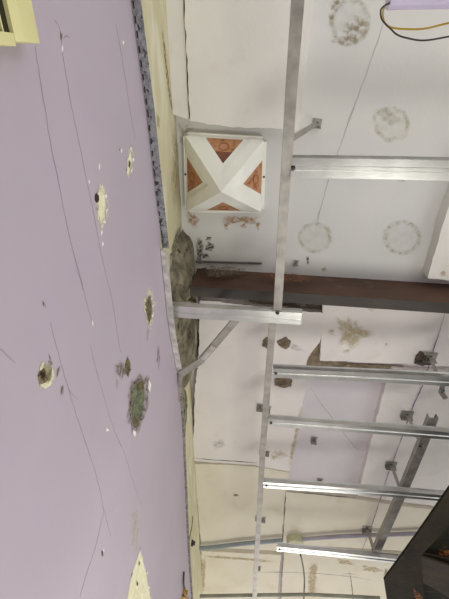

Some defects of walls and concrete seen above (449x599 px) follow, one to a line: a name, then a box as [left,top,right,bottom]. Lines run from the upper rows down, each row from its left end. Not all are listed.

crack [35,47,92,320]
peeling [95,183,108,247]
peeling [169,227,262,303]
spalling [144,291,156,330]
damp [343,323,368,345]
spalling [38,356,54,389]
spalling [117,356,151,436]
peeling [174,317,199,434]